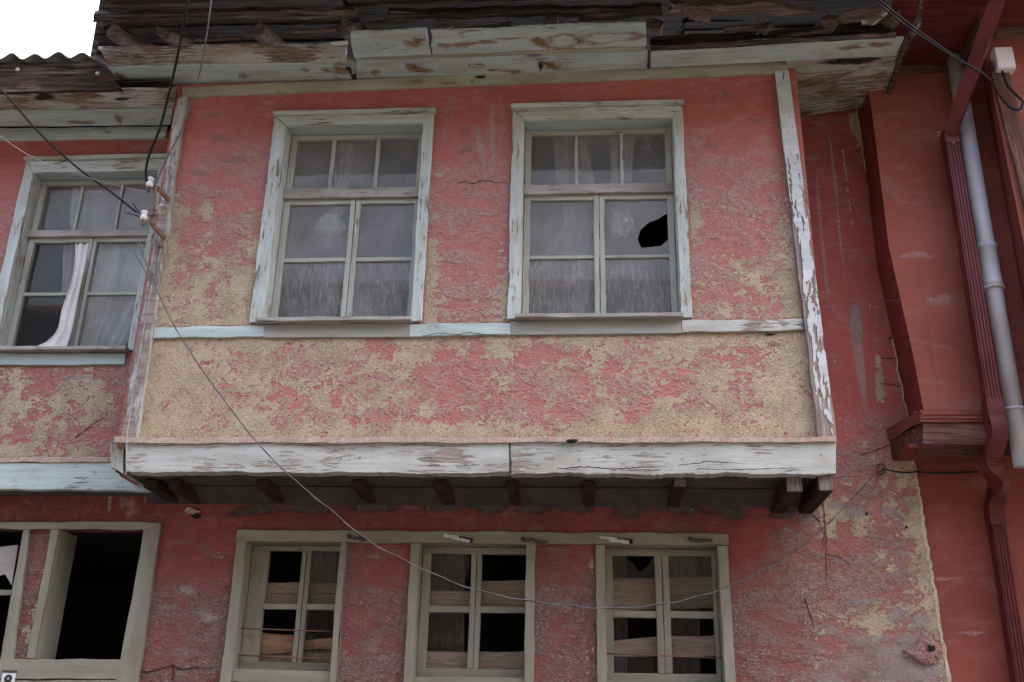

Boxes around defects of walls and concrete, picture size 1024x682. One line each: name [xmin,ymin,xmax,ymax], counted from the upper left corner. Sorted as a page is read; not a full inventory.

peeling [0,71,886,468]
peeling [794,461,951,682]